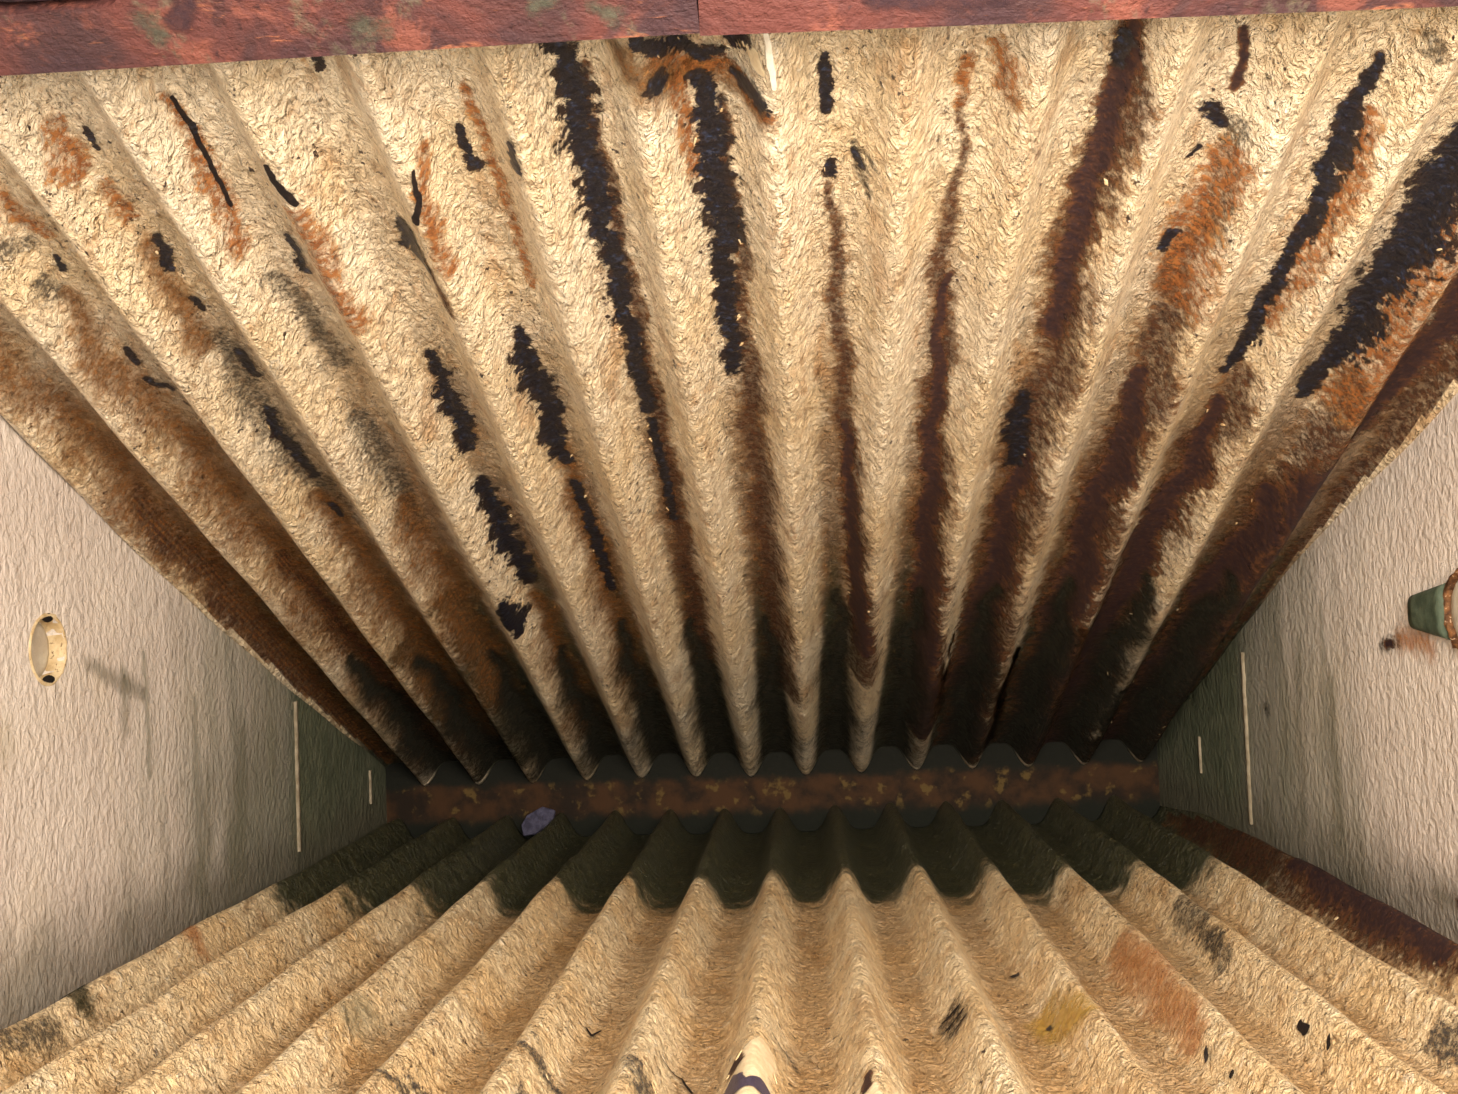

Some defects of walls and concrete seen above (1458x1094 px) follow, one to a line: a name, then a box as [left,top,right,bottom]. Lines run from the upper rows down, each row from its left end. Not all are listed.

rust [165,0,197,31]
rust [159,93,252,262]
water stain [607,39,766,124]
rust [644,49,780,180]
rust [863,0,1015,11]
rust [0,191,448,765]
rust [1169,273,1458,718]
rust [1162,813,1458,995]